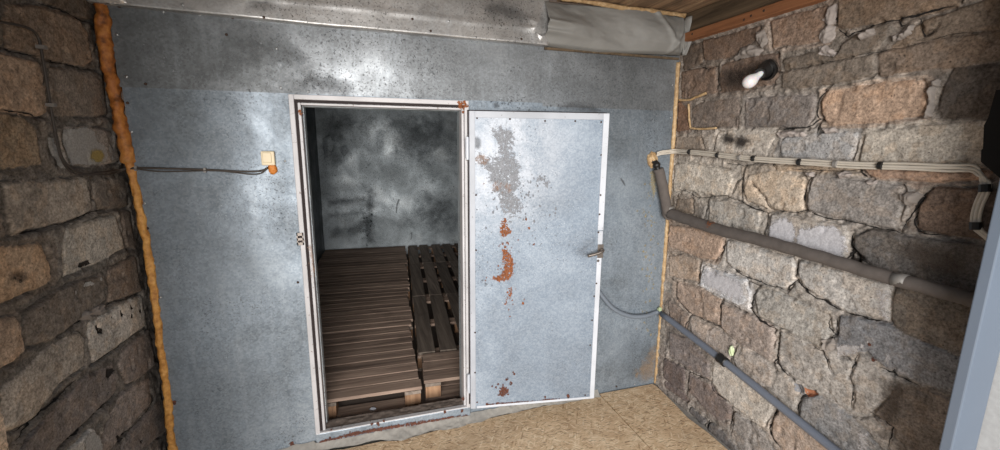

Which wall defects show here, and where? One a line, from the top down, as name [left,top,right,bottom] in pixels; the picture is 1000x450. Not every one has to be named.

peeling [475,125,557,236]
corrosion [485,218,525,317]
corrosion [319,371,570,443]